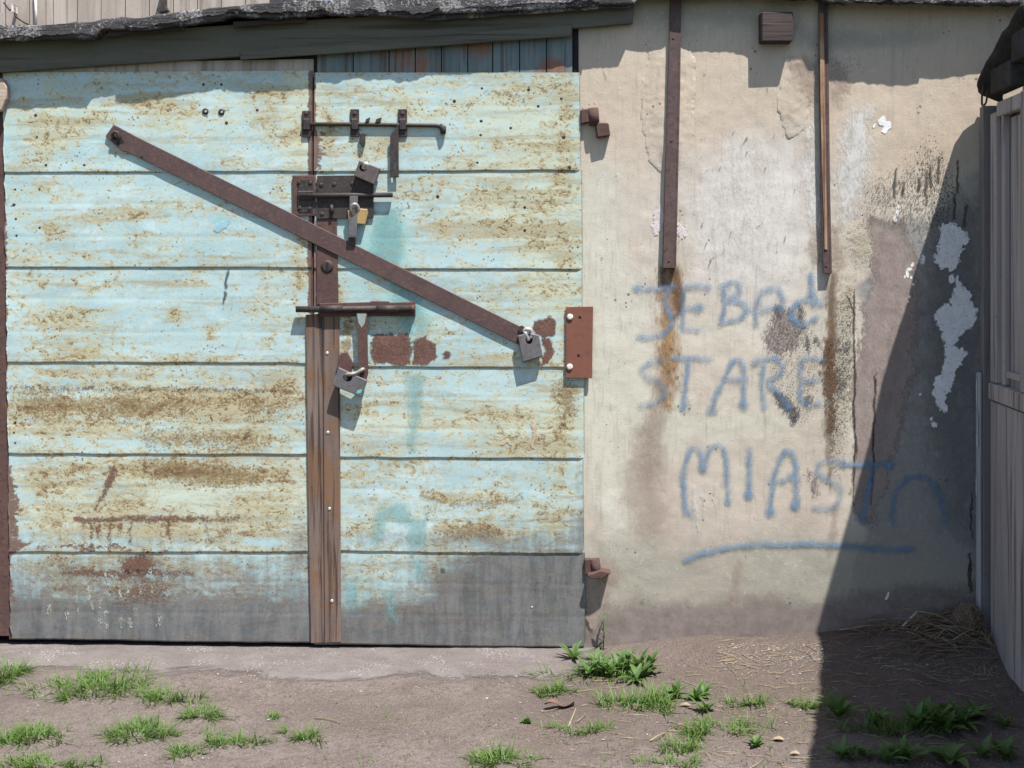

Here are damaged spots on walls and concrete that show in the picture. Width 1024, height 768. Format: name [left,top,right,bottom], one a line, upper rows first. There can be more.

flaking render [873,116,891,134]
corrosion [6,385,292,394]
corrosion [370,332,452,366]
corrosion [532,315,556,366]
corrosion [656,268,685,410]
corrosion [818,274,841,460]
crack [847,289,877,505]
water stain [762,108,977,530]
flaking render [904,222,979,428]
corrosion [60,465,239,607]